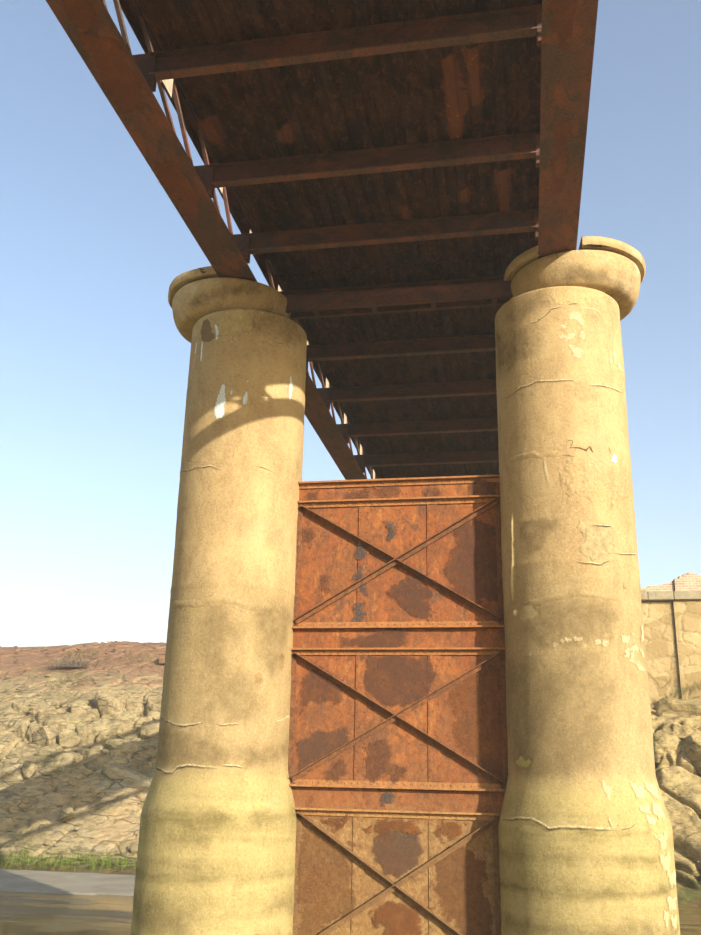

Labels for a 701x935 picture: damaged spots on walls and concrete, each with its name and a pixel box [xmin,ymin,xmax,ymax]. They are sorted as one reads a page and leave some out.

crack [503,379,620,398]
crack [162,719,239,727]
crack [156,764,241,774]
crack [508,817,637,831]